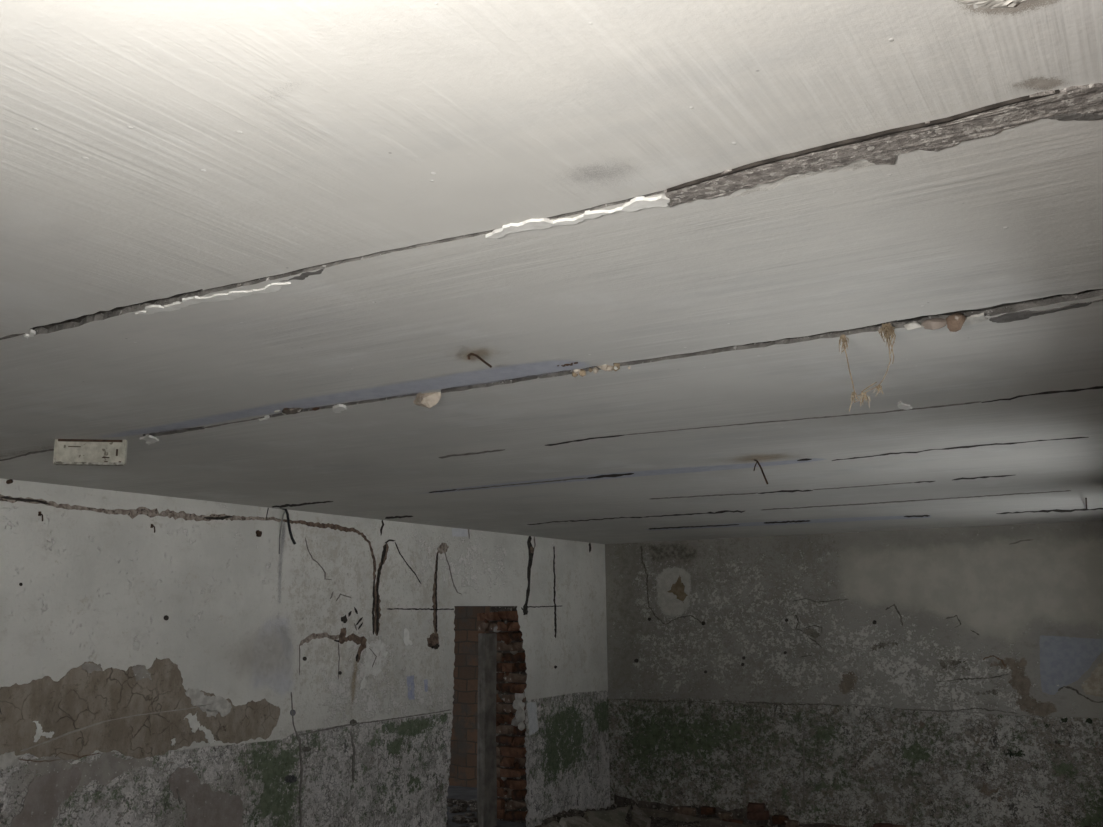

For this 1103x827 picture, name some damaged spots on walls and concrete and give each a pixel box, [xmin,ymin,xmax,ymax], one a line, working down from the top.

spalling [664,83,1103,207]
crack [0,332,25,340]
crack [545,386,1103,446]
crack [0,449,54,461]
crack [439,449,505,459]
crack [832,437,1089,461]
crack [521,475,1103,615]
crack [388,553,461,610]
peeling [640,546,702,624]
peeling [938,655,1068,730]
peeling [0,658,300,827]
flaking render [614,794,853,827]